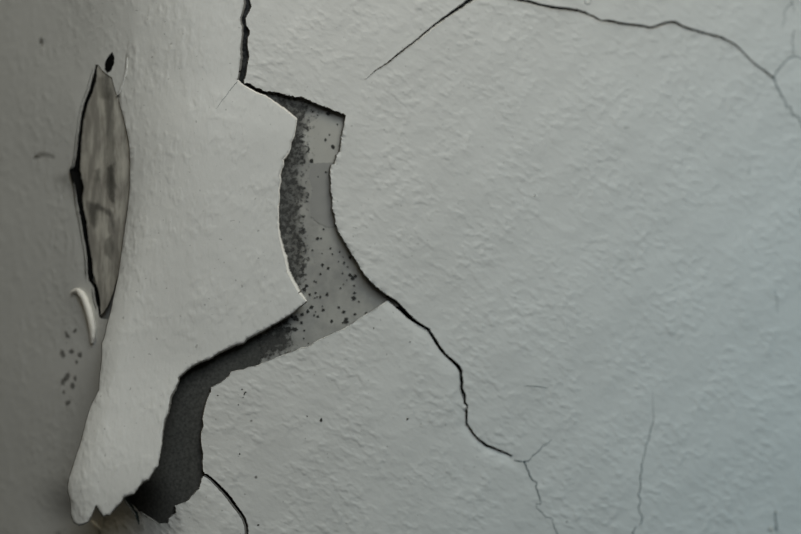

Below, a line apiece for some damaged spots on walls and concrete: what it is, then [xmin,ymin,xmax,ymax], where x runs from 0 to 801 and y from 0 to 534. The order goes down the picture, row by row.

crack [239,0,251,82]
crack [368,0,476,77]
crack [513,0,801,122]
peeling [67,0,398,529]
crack [386,295,558,534]
crack [203,474,247,534]